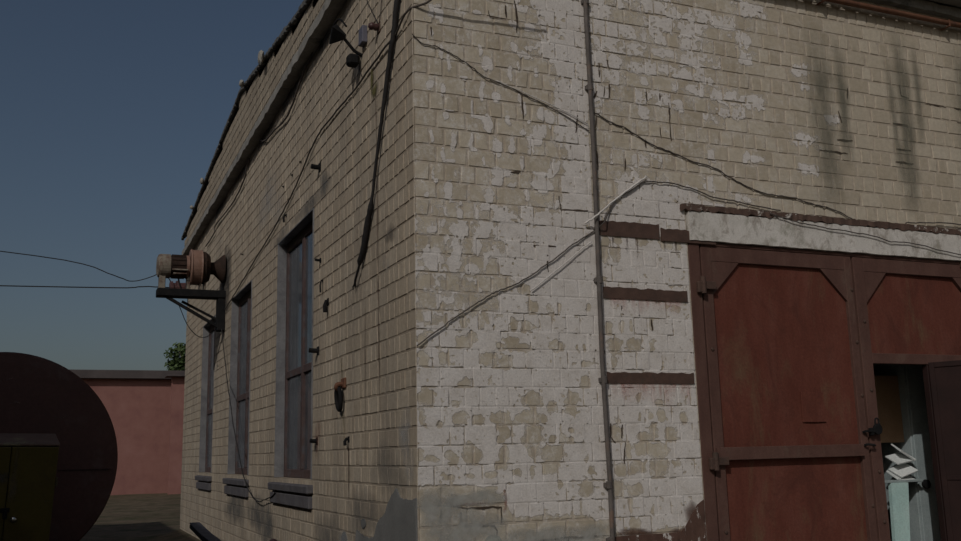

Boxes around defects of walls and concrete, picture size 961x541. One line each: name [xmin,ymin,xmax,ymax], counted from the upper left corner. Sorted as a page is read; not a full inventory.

flaking render [341,488,418,541]
peeling [415,0,766,536]